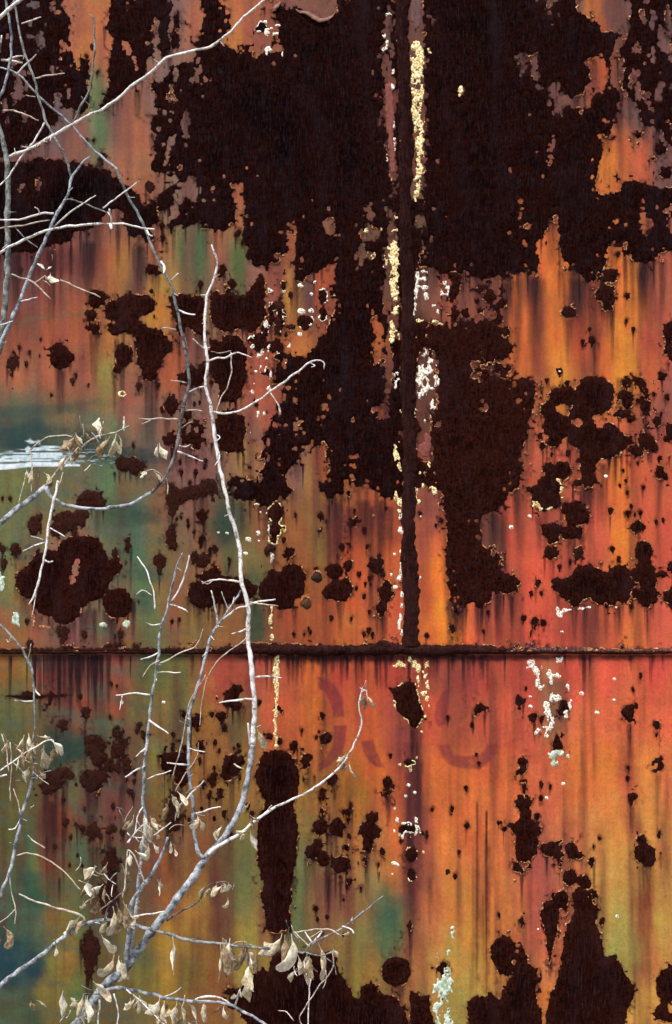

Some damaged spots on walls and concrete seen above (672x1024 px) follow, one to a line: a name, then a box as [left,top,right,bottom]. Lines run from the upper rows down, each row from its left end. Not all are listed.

corrosion [0,0,672,773]
peeling [528,478,564,518]
peeling [556,606,591,618]
corrosion [33,714,151,915]
corrosion [158,684,396,935]
corrosion [398,822,429,882]
corrosion [634,830,662,869]
corrosion [466,754,638,1024]
corrosion [80,926,101,995]
corrosion [222,948,435,1024]
corrosion [431,961,450,978]
corrosion [652,960,672,1023]